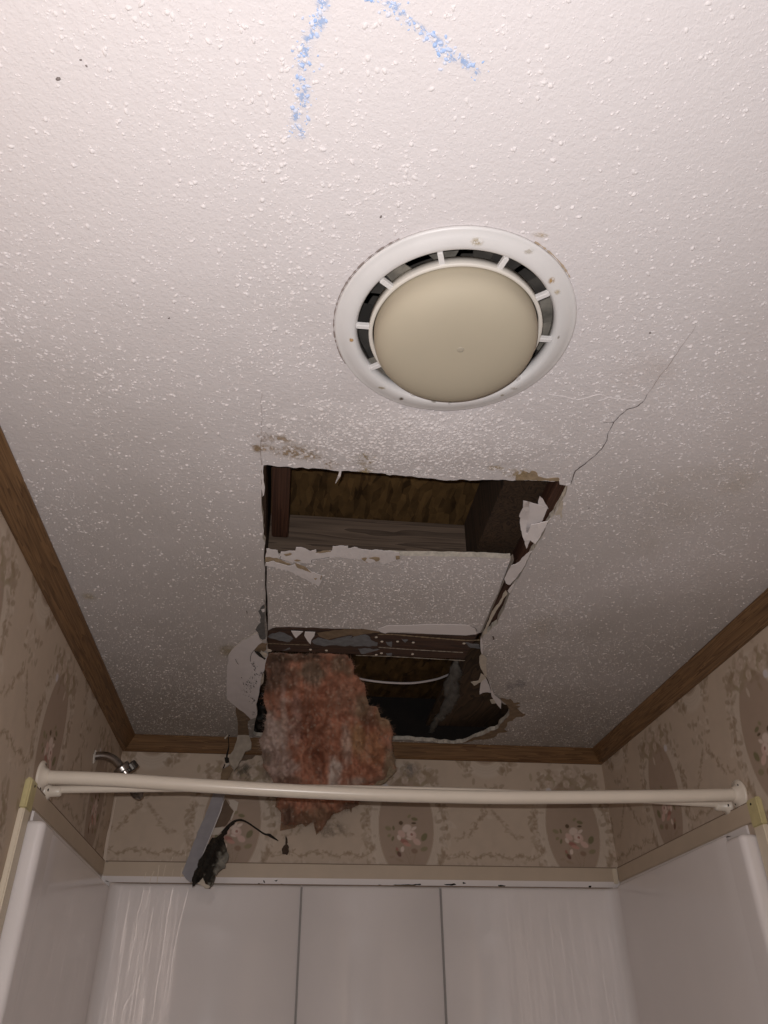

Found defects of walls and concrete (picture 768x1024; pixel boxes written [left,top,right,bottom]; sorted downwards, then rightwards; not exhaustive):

crack [571,328,695,483]
peeling [226,599,272,722]